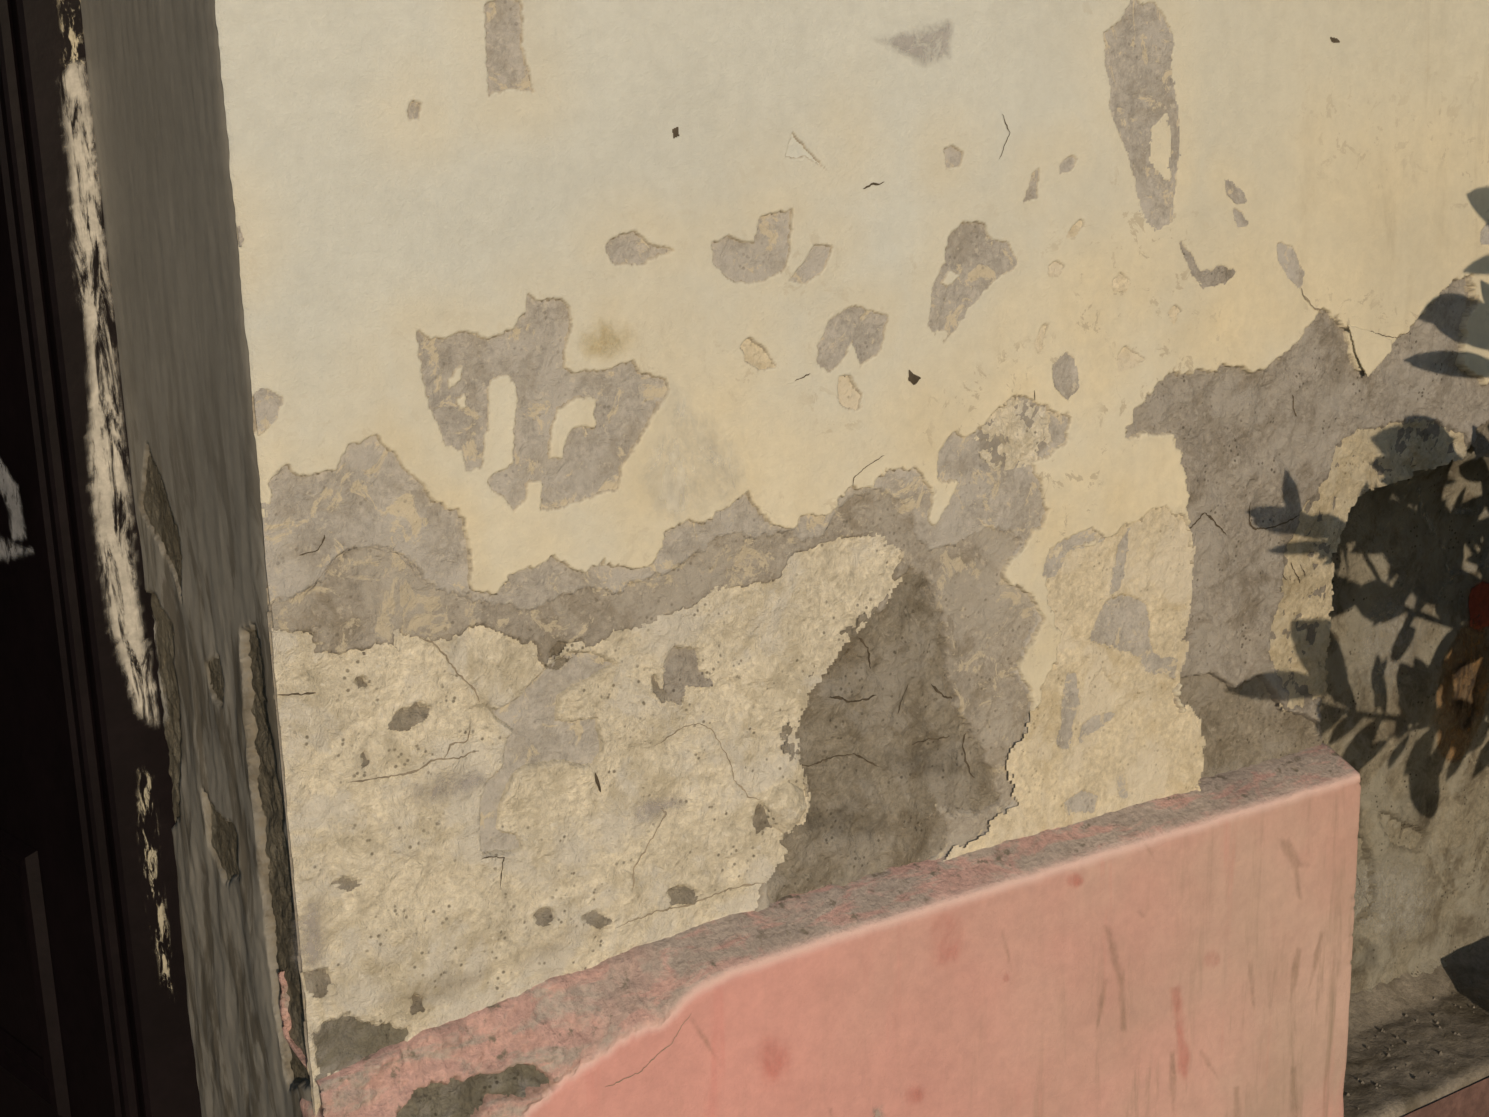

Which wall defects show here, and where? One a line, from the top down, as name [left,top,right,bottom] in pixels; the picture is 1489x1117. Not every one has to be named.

peeling [484,0,532,95]
flaking render [1104,0,1181,232]
flaking render [711,210,830,283]
flaking render [928,223,1017,335]
flaking render [1179,242,1235,289]
flaking render [248,277,1489,1117]